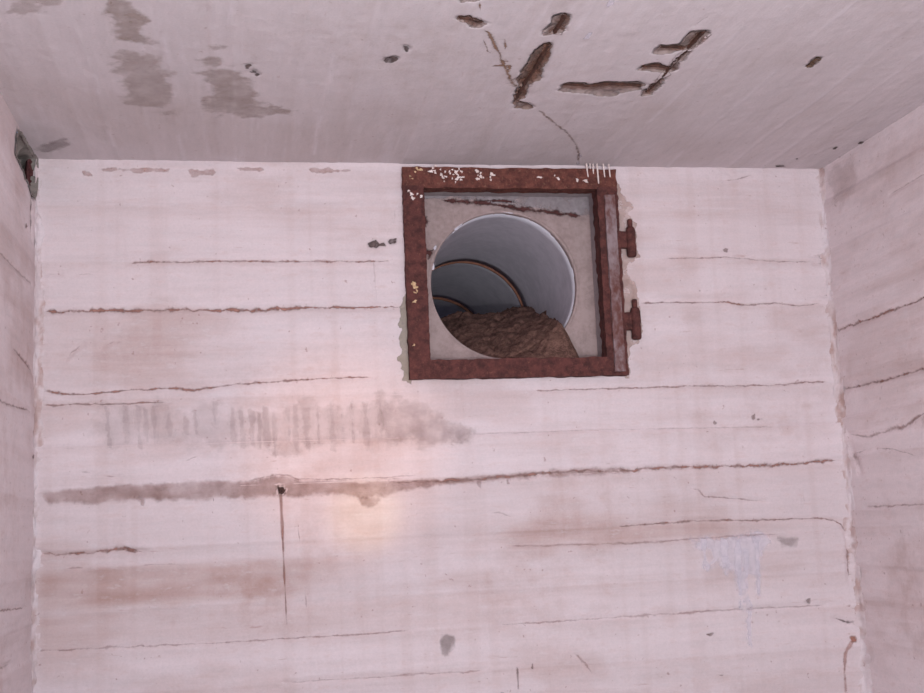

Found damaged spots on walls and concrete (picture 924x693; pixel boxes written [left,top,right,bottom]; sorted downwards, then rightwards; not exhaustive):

spalling [457,15,486,28]
crack [484,31,517,86]
spalling [512,13,570,109]
spalling [557,30,709,97]